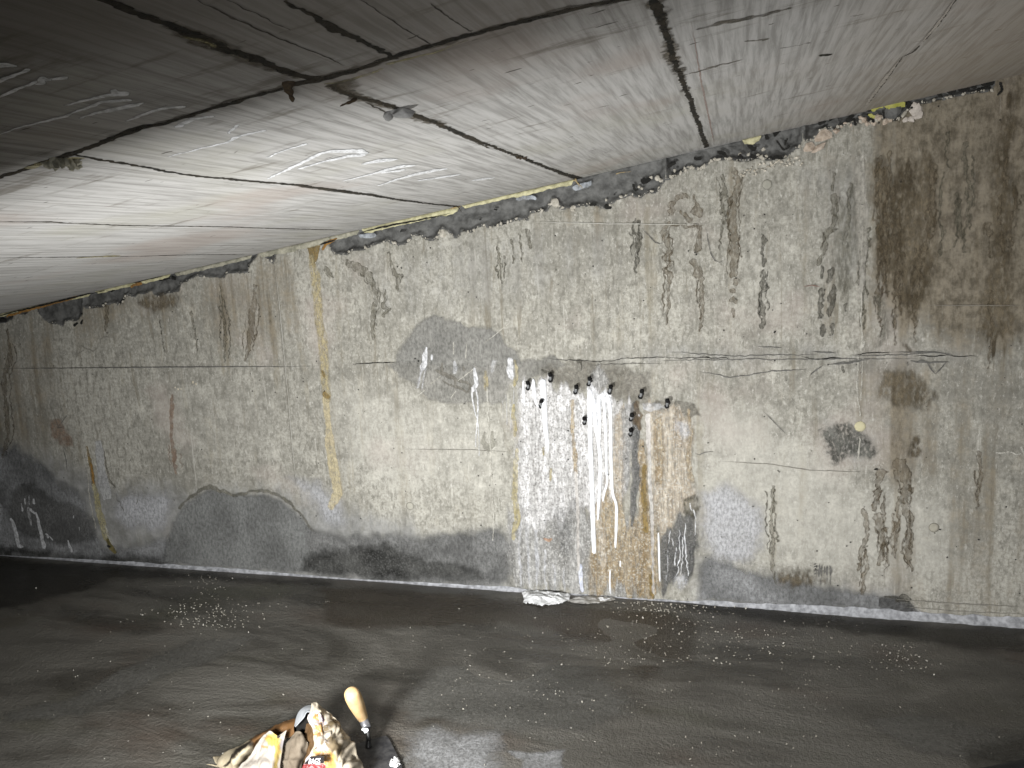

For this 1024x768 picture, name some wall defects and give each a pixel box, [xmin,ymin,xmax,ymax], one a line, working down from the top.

leakage [267,143,495,186]
spalling [329,81,1004,255]
spalling [0,254,276,327]
leakage [629,220,643,273]
leakage [662,193,705,332]
leakage [757,235,770,329]
leakage [817,94,1022,407]
crack [543,346,968,378]
leakage [0,330,520,607]
rust [570,399,578,472]
rust [589,401,695,599]
leakage [541,359,1024,647]